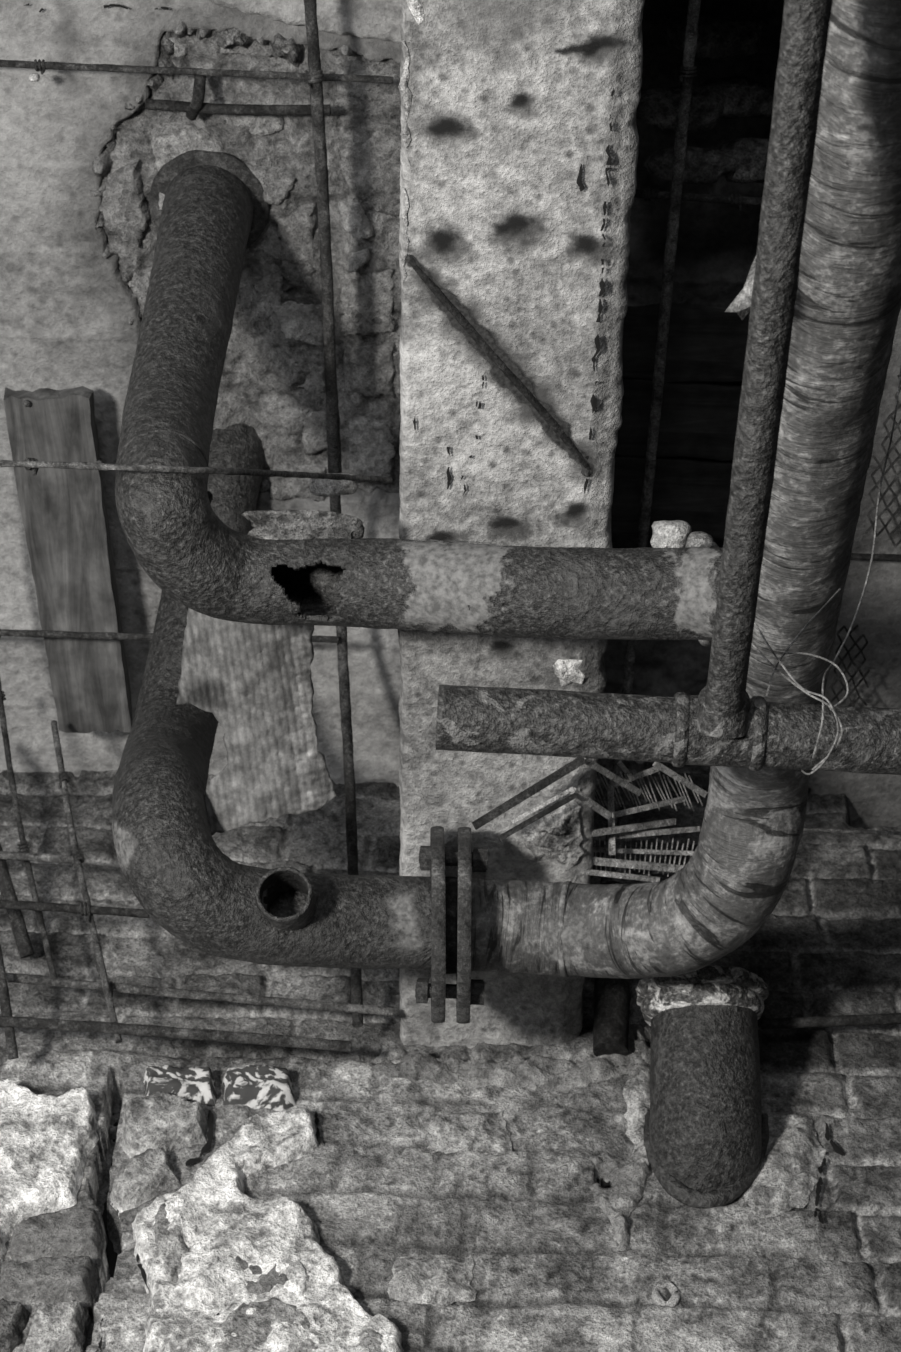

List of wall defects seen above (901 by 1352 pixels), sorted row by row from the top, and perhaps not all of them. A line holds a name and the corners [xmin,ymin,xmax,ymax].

spalling [407,0,425,25]
spalling [90,19,412,502]
flaking render [0,1078,99,1266]
flaking render [132,1108,404,1352]
crack [814,1123,845,1229]